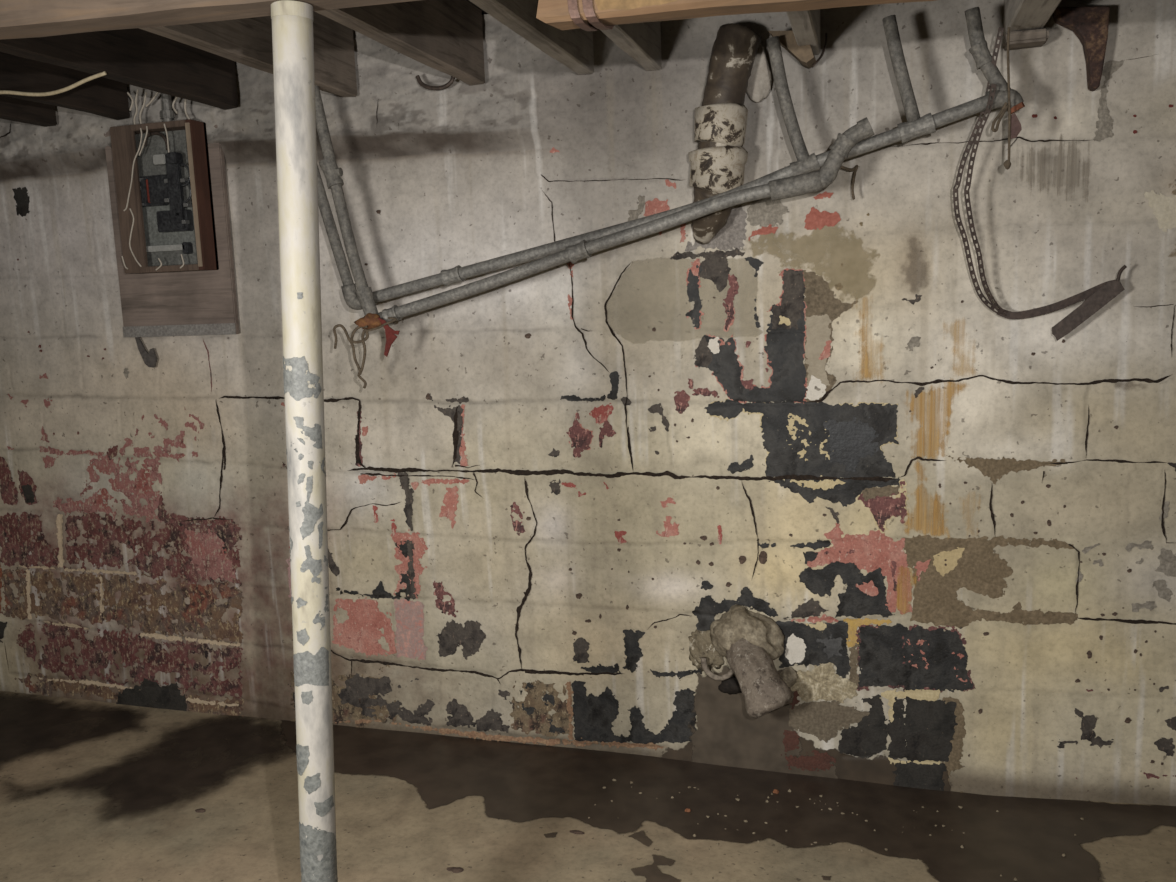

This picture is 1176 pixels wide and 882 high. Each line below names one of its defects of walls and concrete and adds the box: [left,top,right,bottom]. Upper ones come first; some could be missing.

peeling [0,414,246,717]
peeling [281,356,702,751]
crack [324,175,946,685]
peeling [648,199,1114,791]
corrosion [905,486,949,537]
corrosion [910,324,974,472]
crack [809,304,1176,543]
crack [1068,544,1176,625]
leakage [0,693,144,764]
leakage [14,715,297,819]
leakage [333,665,1176,882]
peeling [1144,716,1176,779]